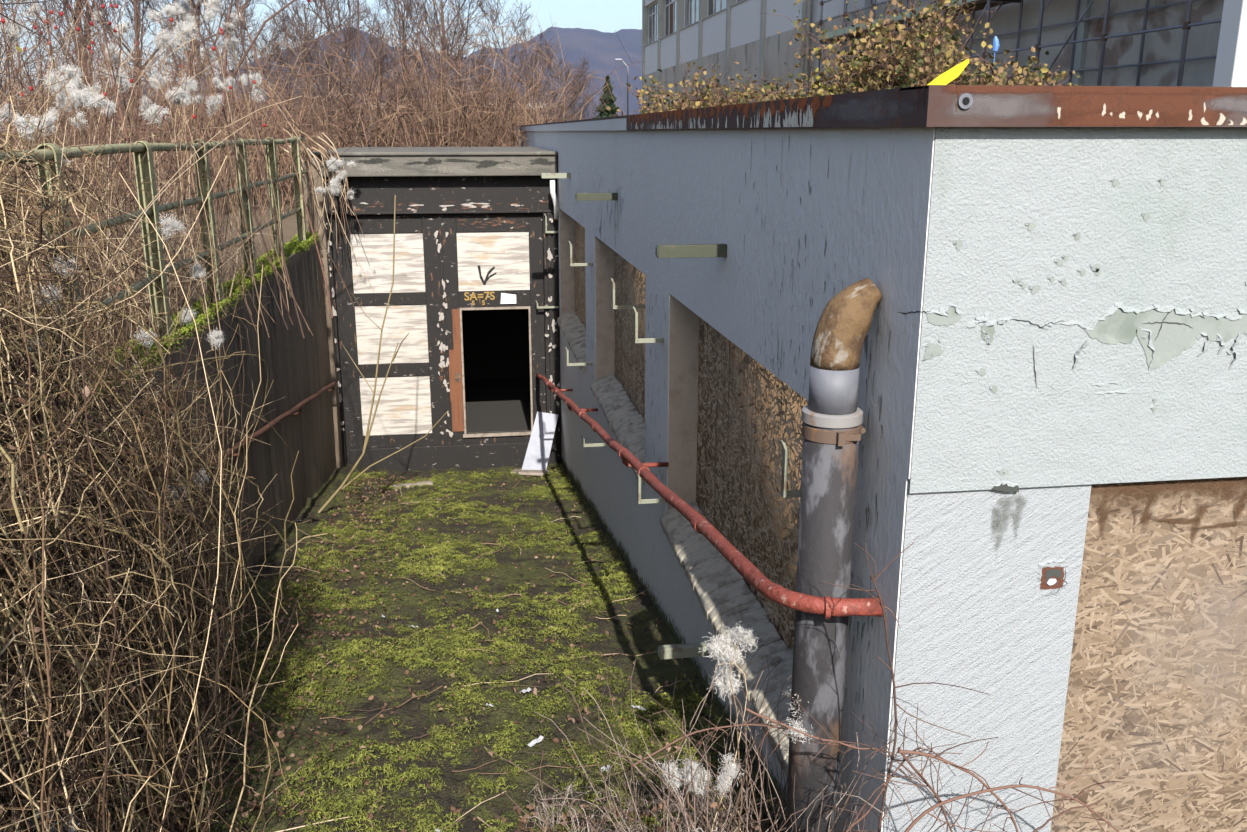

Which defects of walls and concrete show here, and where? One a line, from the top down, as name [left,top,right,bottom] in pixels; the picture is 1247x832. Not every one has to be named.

rust [628,95,832,125]
rust [944,85,1247,126]
peeling [922,304,1011,361]
peeling [1045,302,1247,371]
rust [1034,557,1069,596]